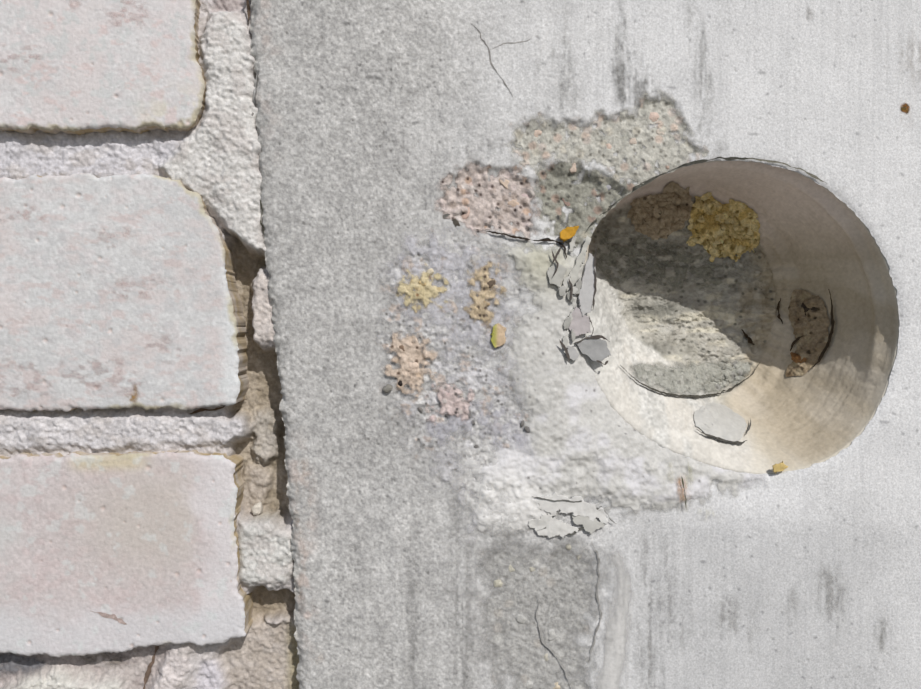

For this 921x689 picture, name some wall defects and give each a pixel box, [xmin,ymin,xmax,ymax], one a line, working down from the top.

crack [472,24,530,97]
spalling [377,93,709,491]